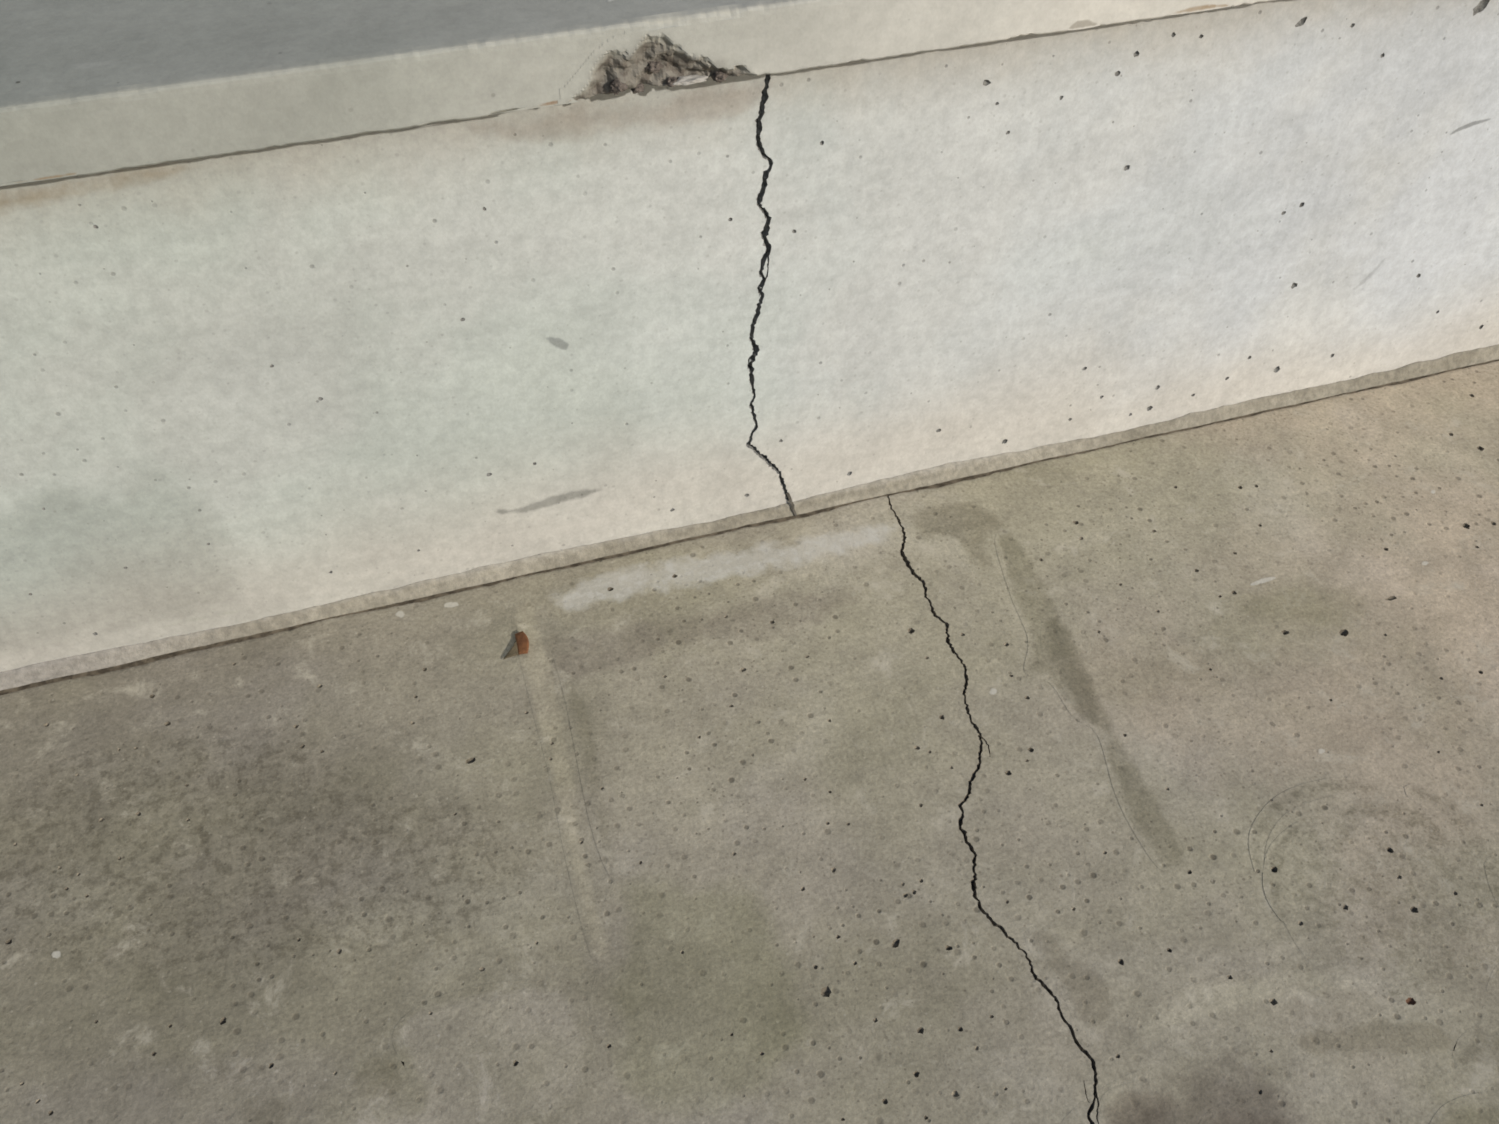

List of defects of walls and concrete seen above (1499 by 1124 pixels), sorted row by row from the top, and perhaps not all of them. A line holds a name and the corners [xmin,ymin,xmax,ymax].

spalling [558,27,758,106]
crack [746,74,797,516]
crack [887,496,1099,1124]